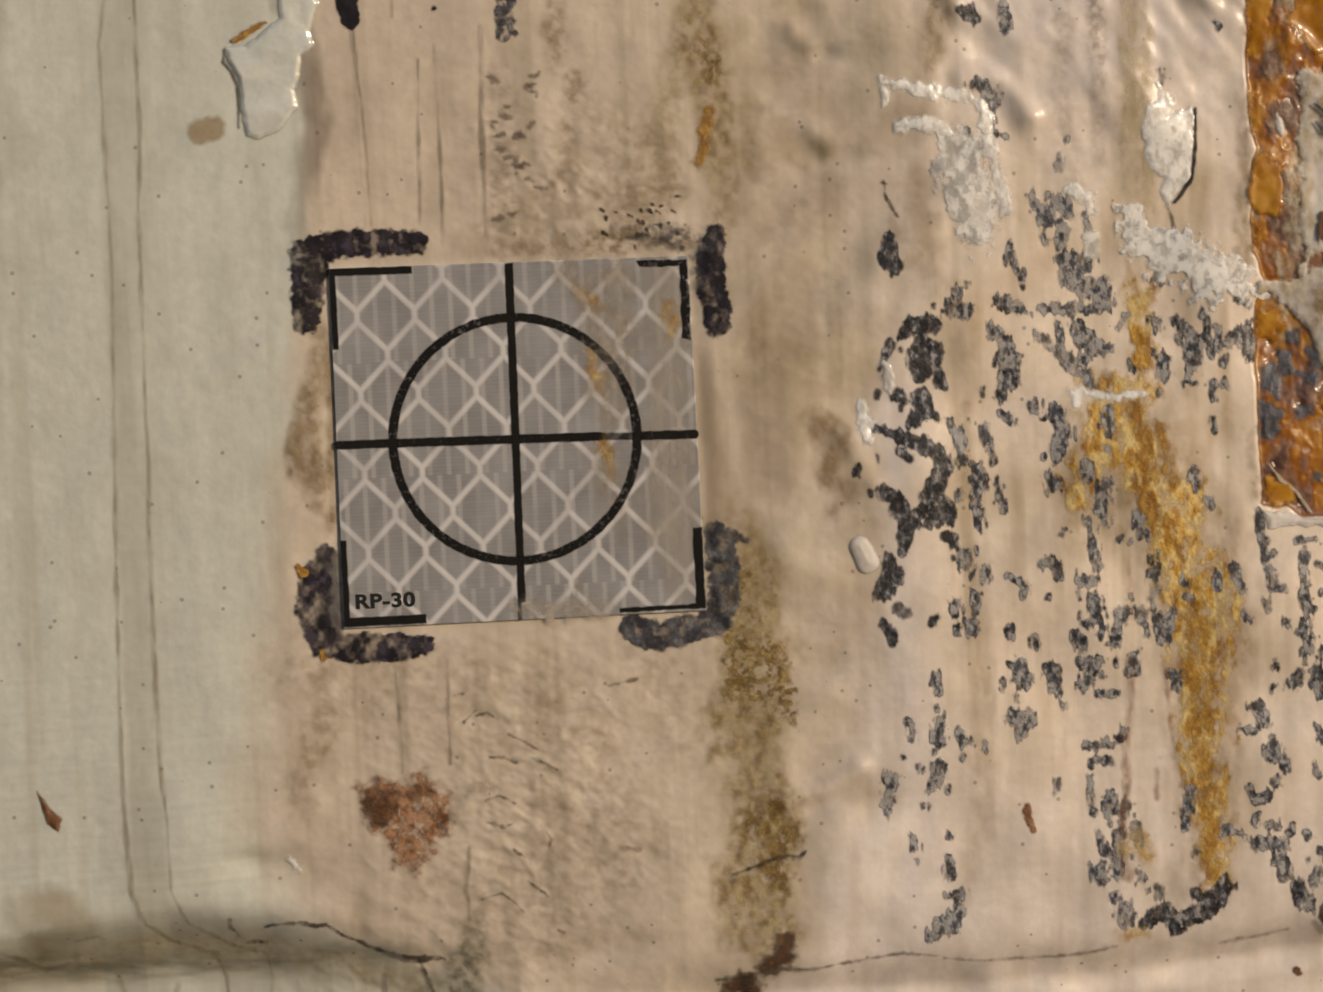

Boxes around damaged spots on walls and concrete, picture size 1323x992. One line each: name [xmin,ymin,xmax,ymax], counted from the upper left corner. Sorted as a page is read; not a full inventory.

peeling [222,0,319,140]
spalling [852,68,1271,647]
rust [1246,0,1323,517]
spalling [999,458,1195,744]
rust [1056,279,1244,892]
rust [356,773,449,871]
spalling [909,831,923,865]
spalling [880,669,989,819]
spalling [925,830,966,943]
spalling [1081,726,1238,936]
spalling [1211,506,1323,913]